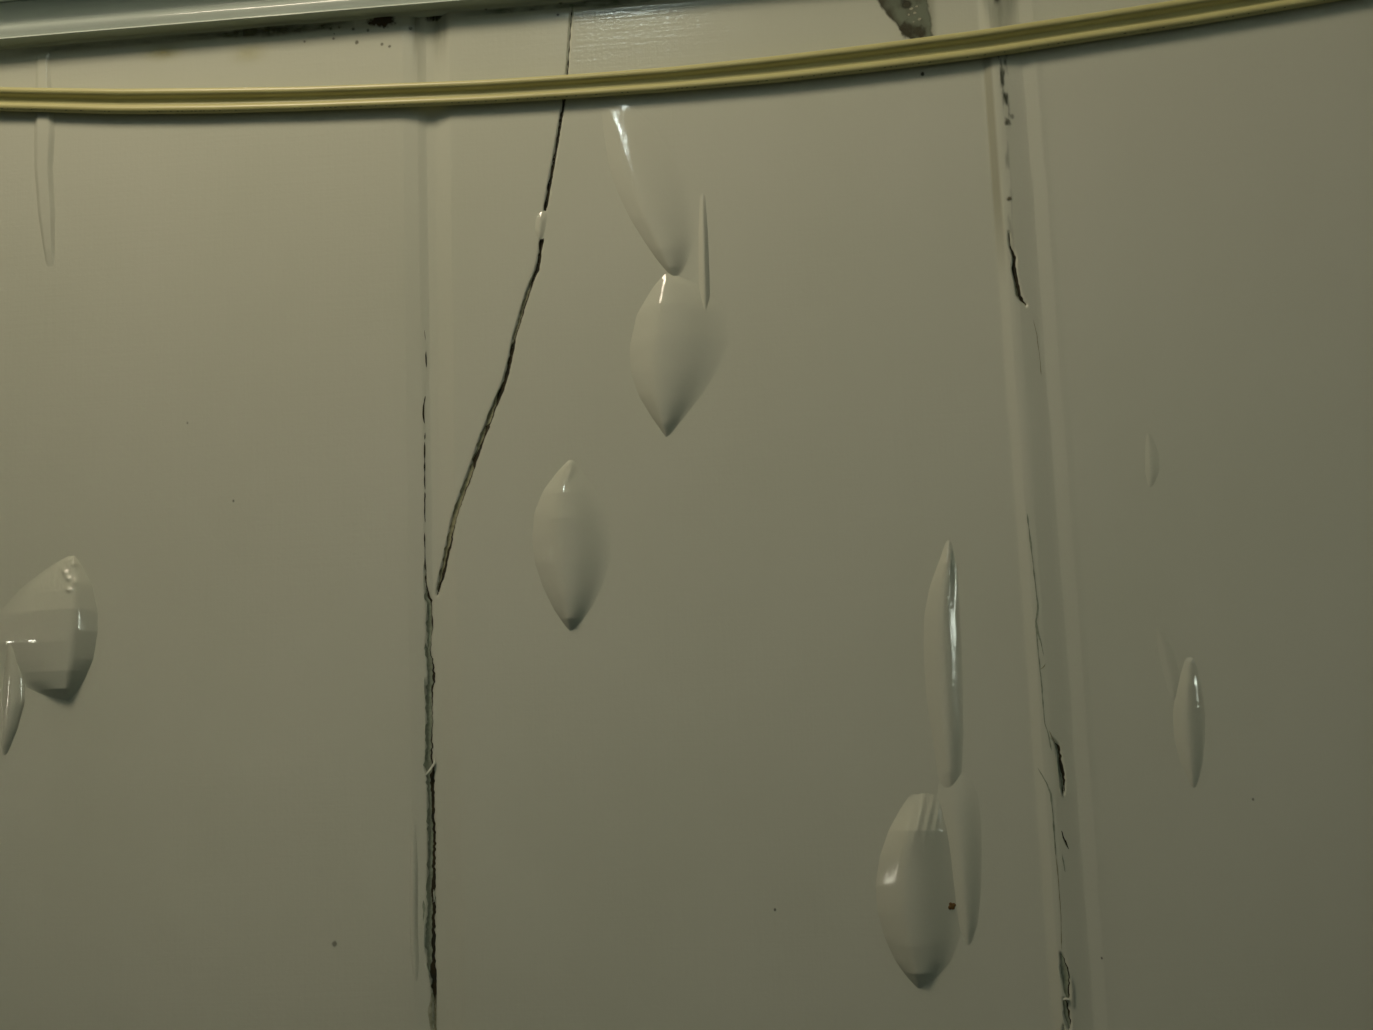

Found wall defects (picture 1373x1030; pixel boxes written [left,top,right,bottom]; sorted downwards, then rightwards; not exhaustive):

crack [422,12,572,1030]
crack [1008,233,1041,372]
crack [1027,515,1073,1030]